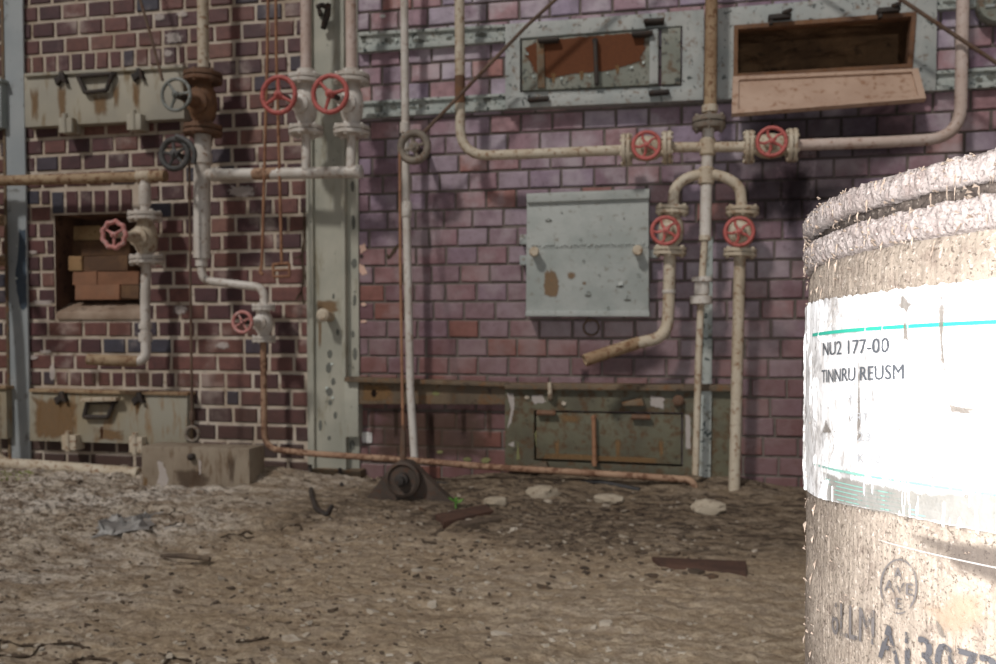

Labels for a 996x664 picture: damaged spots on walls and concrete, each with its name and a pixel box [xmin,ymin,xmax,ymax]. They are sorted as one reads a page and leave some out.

corrosion [544,271,586,296]
corrosion [33,398,76,438]